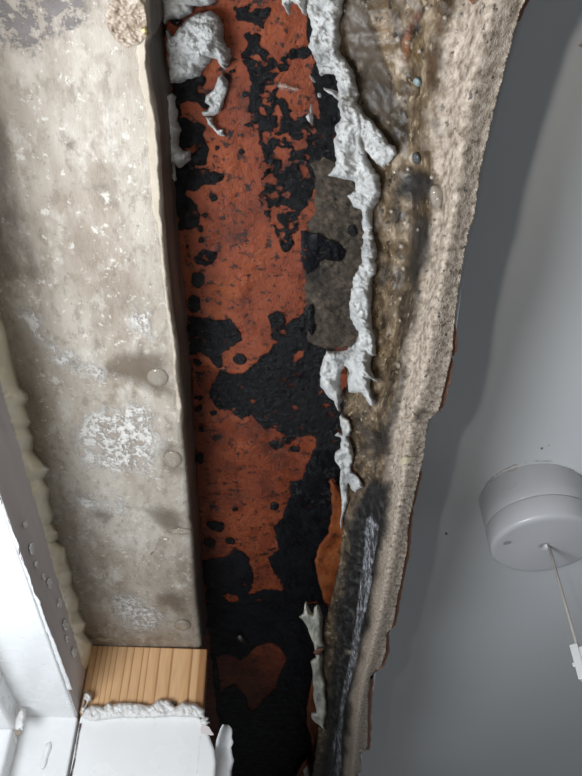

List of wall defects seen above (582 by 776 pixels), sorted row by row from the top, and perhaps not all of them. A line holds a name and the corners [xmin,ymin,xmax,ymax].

damp [0,0,85,48]
damp [398,171,433,206]
damp [409,214,428,293]
damp [75,404,172,472]
damp [363,407,395,455]
damp [113,595,162,632]
damp [322,482,390,776]
flaking render [201,724,234,776]